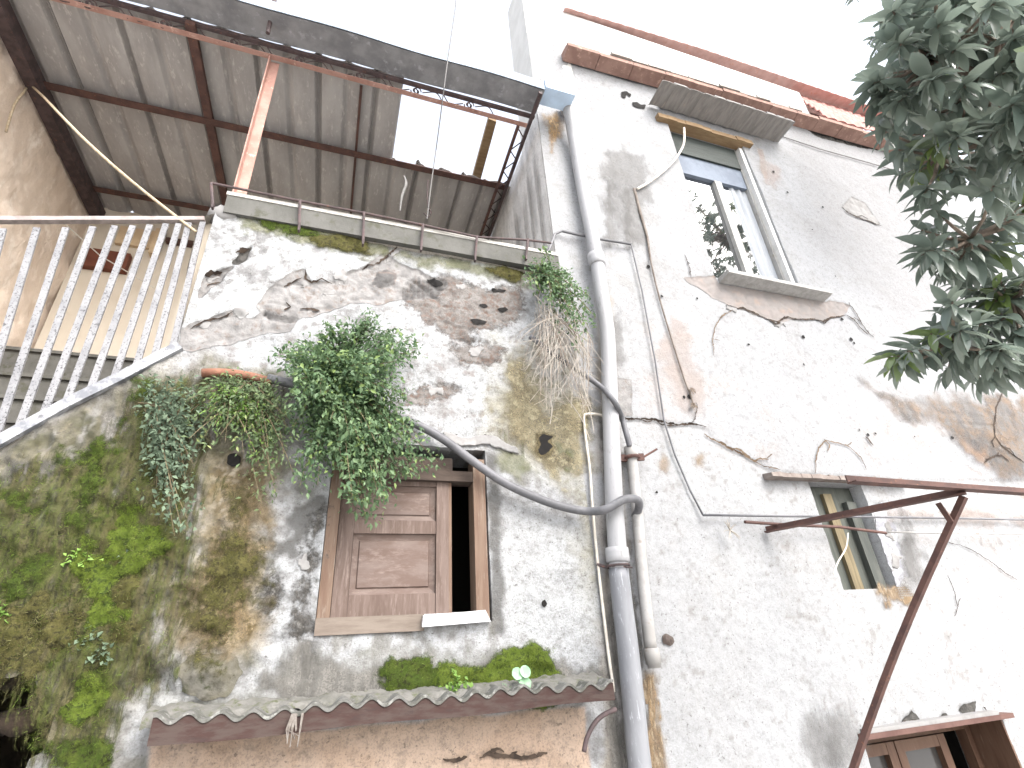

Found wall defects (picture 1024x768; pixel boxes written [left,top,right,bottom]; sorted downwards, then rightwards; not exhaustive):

flaking render [179,247,526,367]
flaking render [684,275,850,328]
crack [712,303,872,352]
crack [625,403,780,470]
crack [984,394,1024,463]
water stain [190,470,276,656]
water stain [259,641,387,698]